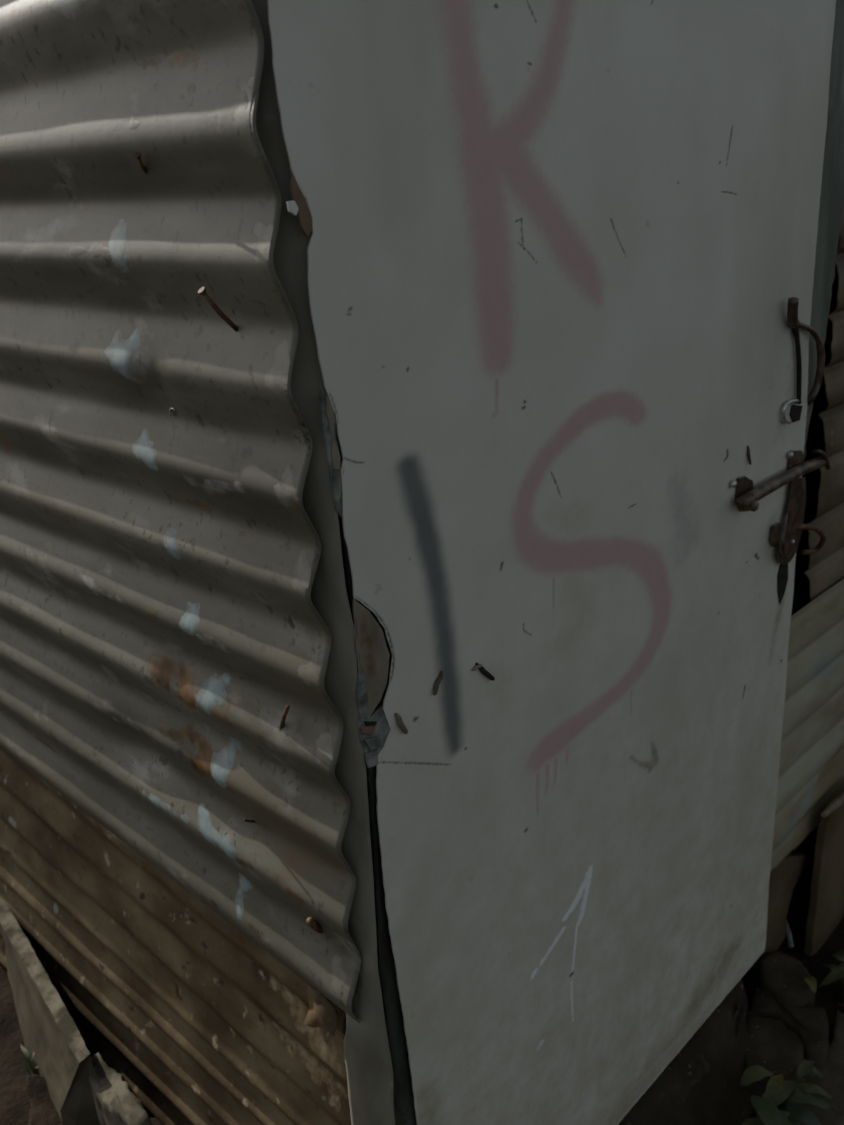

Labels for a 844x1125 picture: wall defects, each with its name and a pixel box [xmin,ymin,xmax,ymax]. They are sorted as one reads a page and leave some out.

rust [149,656,196,710]
rust [158,723,213,779]
peeling [357,704,389,768]